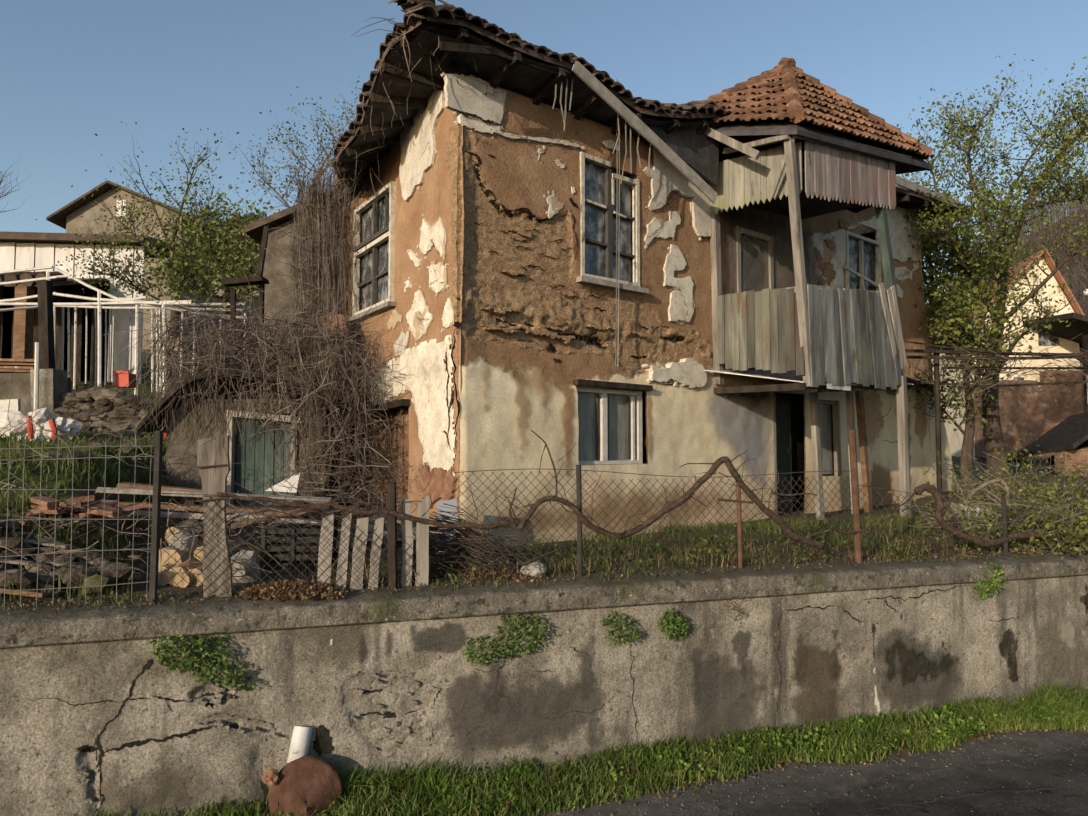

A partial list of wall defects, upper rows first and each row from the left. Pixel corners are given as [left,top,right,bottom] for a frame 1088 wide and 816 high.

crack [448,106,500,125]
flaking render [399,73,585,201]
flaking render [385,214,454,357]
flaking render [543,190,563,219]
crack [463,150,685,369]
flaking render [642,146,711,325]
flaking render [805,206,921,299]
crack [1,659,262,814]
spalling [340,670,440,772]
damp [449,639,600,750]
crack [775,585,972,725]
damp [872,624,958,714]